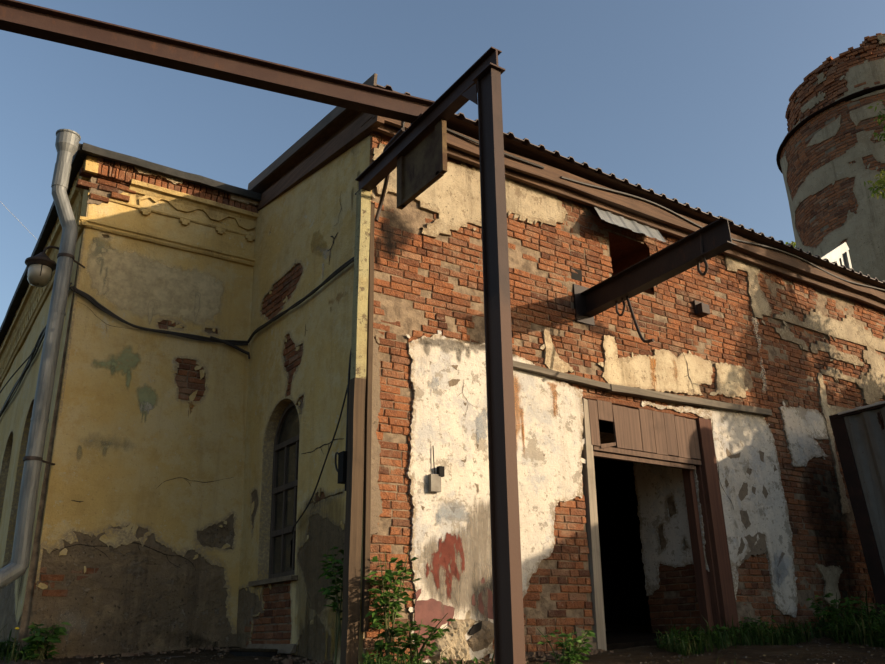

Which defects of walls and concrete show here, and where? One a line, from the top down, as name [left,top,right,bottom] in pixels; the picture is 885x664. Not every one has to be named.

flaking render [780,58,885,248]
water stain [93,348,157,421]
flaking render [175,358,205,401]
flaking render [262,263,303,320]
flaking render [283,334,303,396]
water stain [376,208,414,264]
peeling [406,330,494,663]
peeling [513,329,586,597]
peeling [598,254,885,618]
peeling [0,514,335,663]